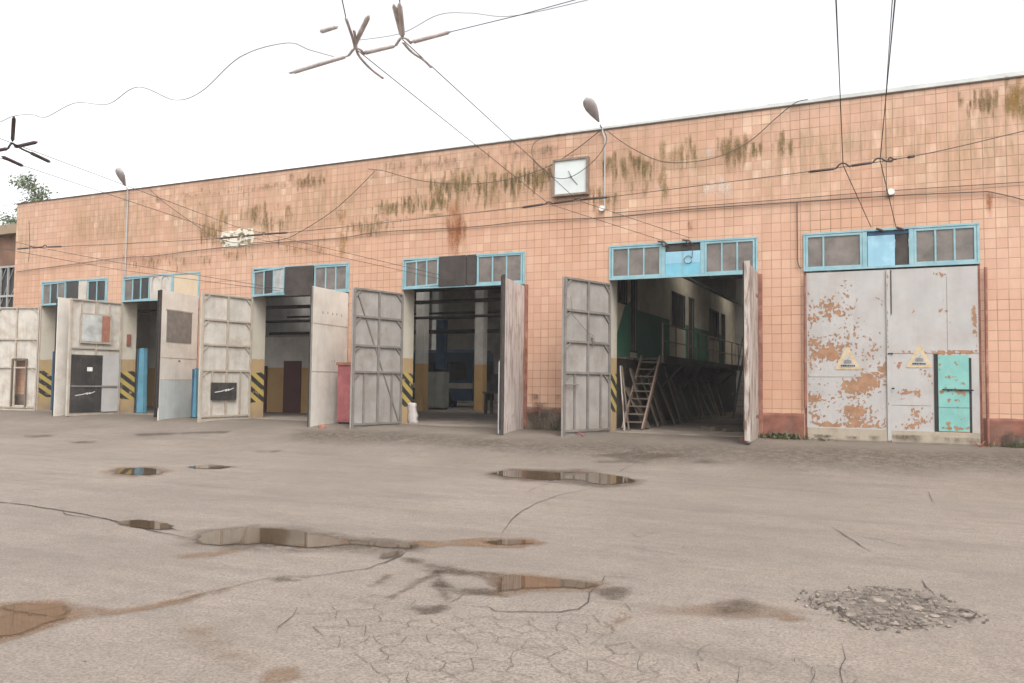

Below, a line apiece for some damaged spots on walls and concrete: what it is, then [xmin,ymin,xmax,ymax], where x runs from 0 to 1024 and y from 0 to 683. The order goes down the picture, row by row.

leakage [381,161,549,211]
peeling [808,280,977,431]
crack [1,502,115,521]
crack [277,576,860,683]